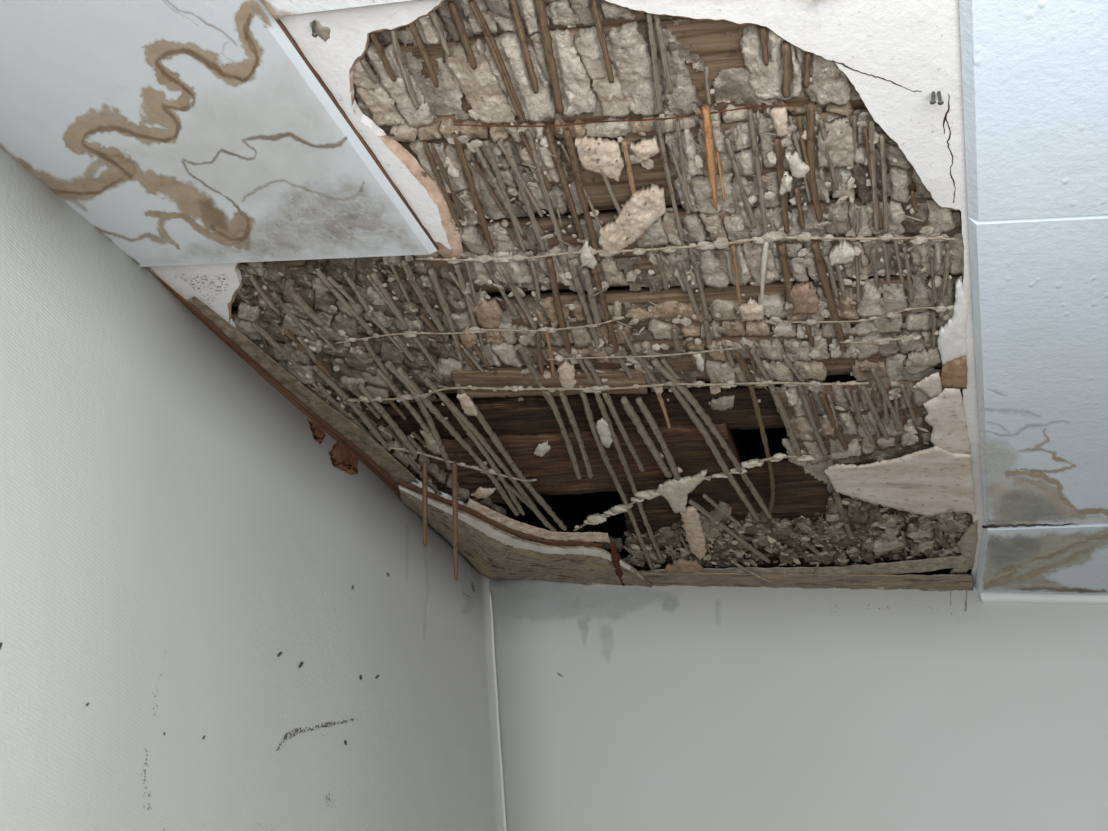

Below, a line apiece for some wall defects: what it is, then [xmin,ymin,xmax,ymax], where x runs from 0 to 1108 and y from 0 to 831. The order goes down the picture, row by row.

crack [832,60,922,92]
damp [0,0,347,250]
crack [943,94,956,203]
damp [264,198,395,252]
flaking render [228,0,973,571]
damp [993,431,1108,519]
damp [983,529,1108,592]